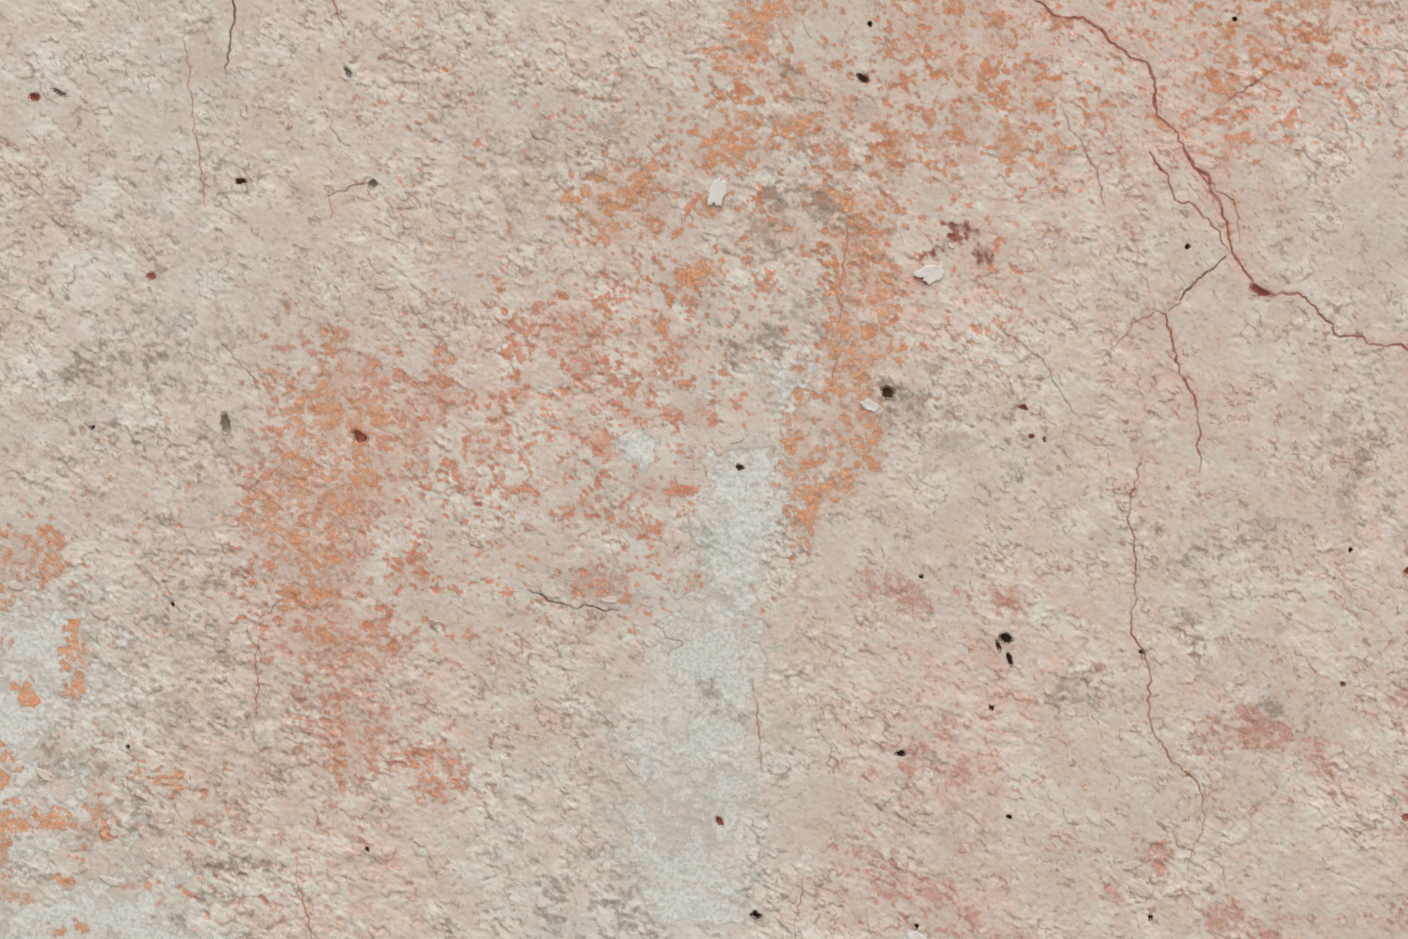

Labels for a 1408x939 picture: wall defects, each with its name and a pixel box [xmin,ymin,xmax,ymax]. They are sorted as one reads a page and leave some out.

crack [227,0,236,61]
peeling [686,176,728,217]
crack [1035,0,1408,459]
spalling [861,399,890,417]
peeling [0,547,249,939]
crack [1130,623,1204,798]